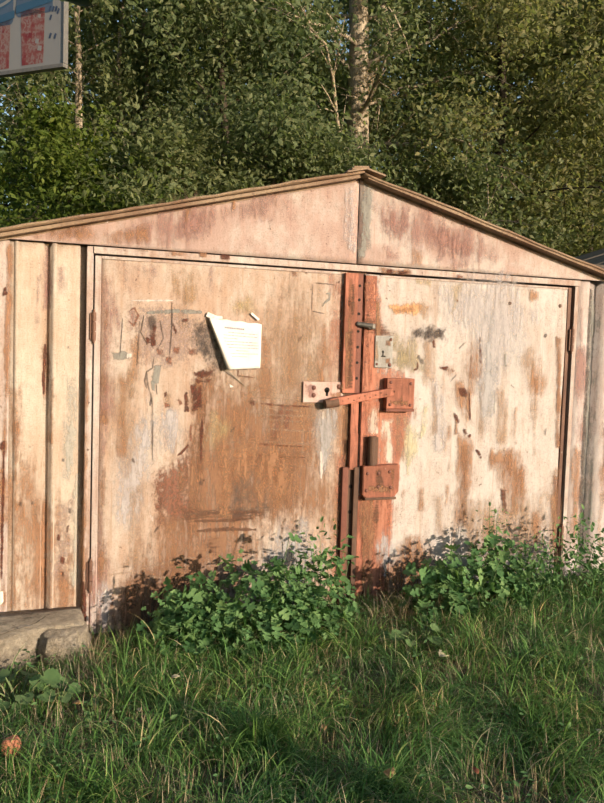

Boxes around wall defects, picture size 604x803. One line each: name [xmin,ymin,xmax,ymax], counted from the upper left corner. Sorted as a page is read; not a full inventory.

rust [3,245,17,396]
rust [37,250,51,308]
rust [382,267,411,275]
rust [382,207,491,263]
rust [0,274,411,631]
rust [448,338,560,552]
rust [358,492,430,603]